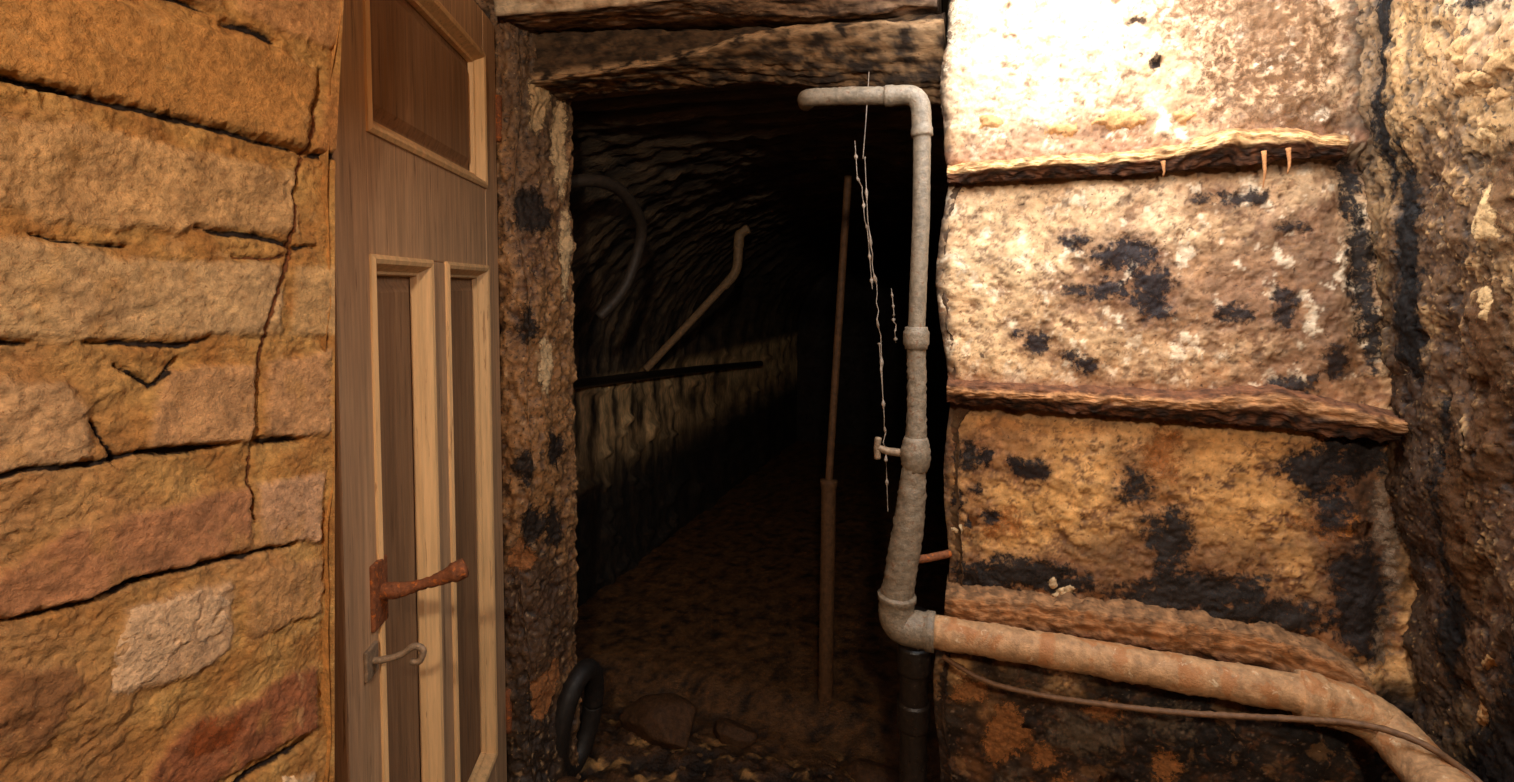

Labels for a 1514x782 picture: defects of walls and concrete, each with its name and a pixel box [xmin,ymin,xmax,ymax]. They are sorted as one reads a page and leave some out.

crack [164,0,273,44]
leakage [946,0,1051,136]
leakage [1189,188,1269,207]
leakage [1057,229,1178,321]
leakage [1213,285,1300,330]
leakage [1011,329,1099,376]
crack [0,421,296,621]
leakage [950,436,1403,672]
crack [233,740,302,782]